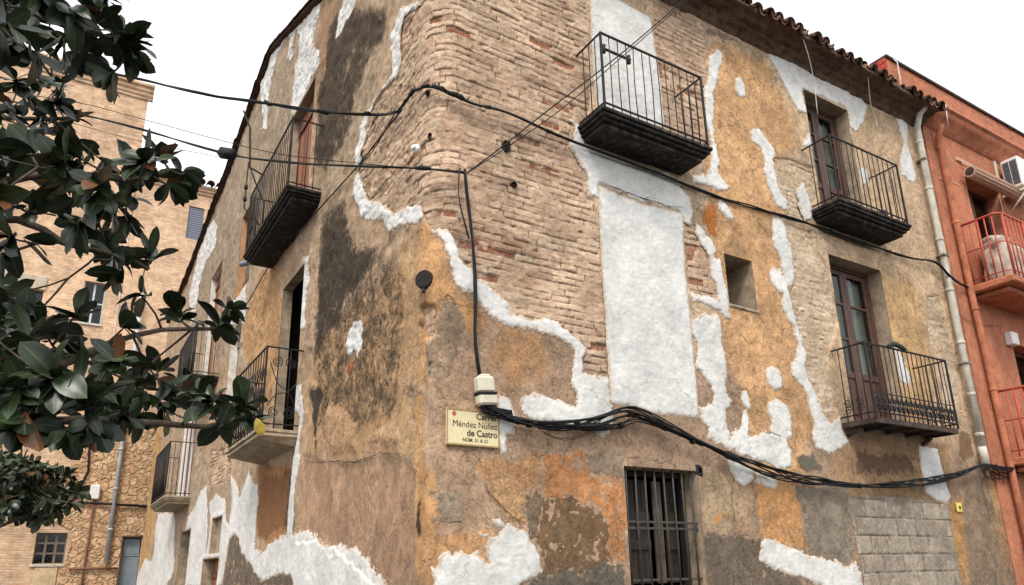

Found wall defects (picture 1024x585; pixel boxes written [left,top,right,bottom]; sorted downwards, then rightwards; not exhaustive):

damp [314,5,387,171]
spalling [653,0,708,144]
damp [307,200,404,450]
spalling [359,0,607,381]
spalling [683,222,714,297]
crack [303,452,416,474]
peeling [486,449,627,576]